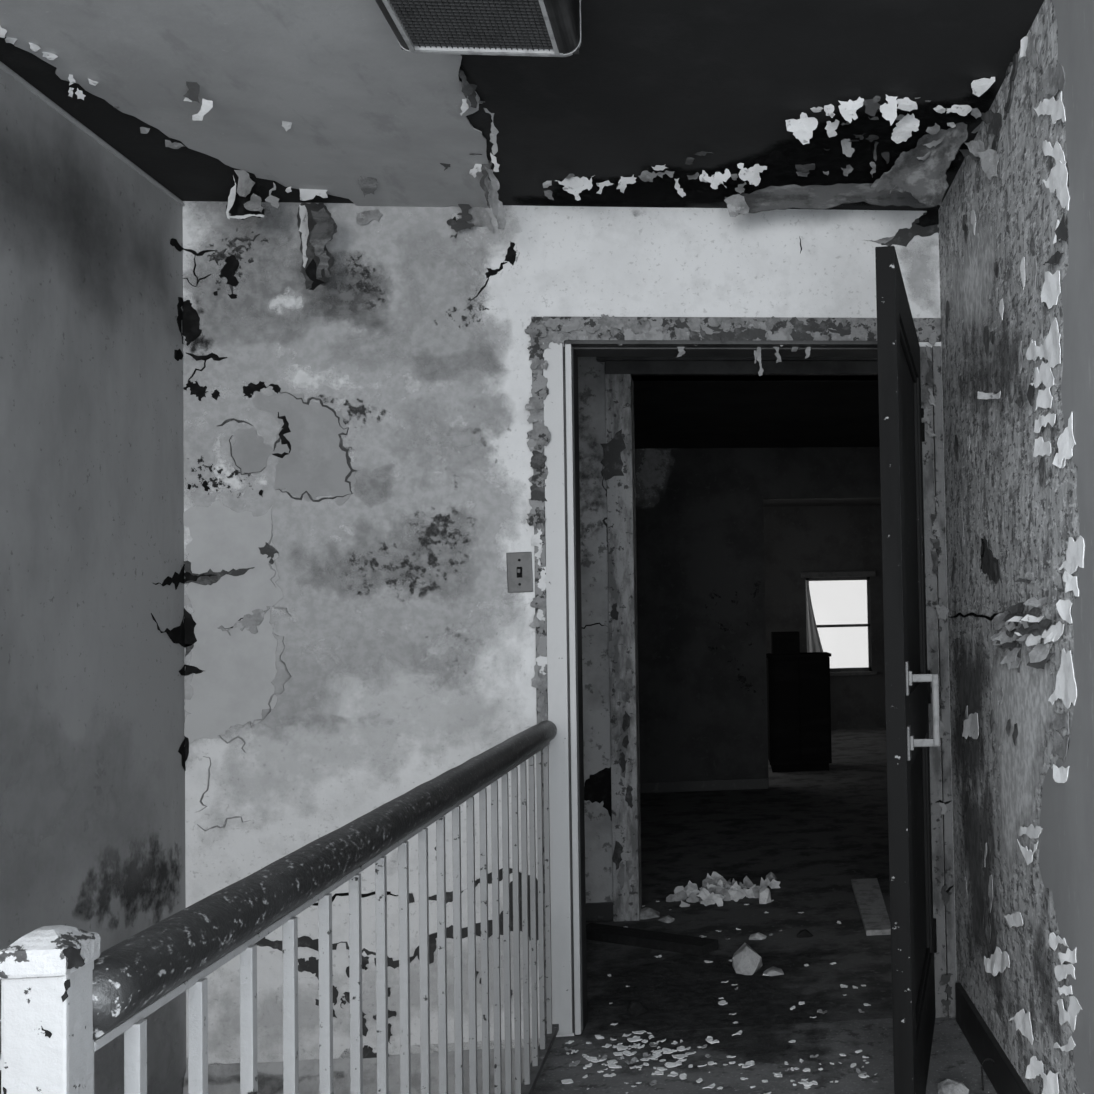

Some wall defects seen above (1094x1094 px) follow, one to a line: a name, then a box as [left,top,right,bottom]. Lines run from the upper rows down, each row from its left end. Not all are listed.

peeling [543,151,767,201]
water stain [518,89,995,208]
crack [470,241,520,301]
crack [272,412,291,458]
flaking render [218,381,356,505]
water stain [183,201,513,730]
peeling [525,314,872,722]
peeling [785,0,1094,1094]
crack [151,561,291,676]
peeling [178,480,291,771]
water stain [954,644,1056,958]
water stain [1034,927,1061,1042]